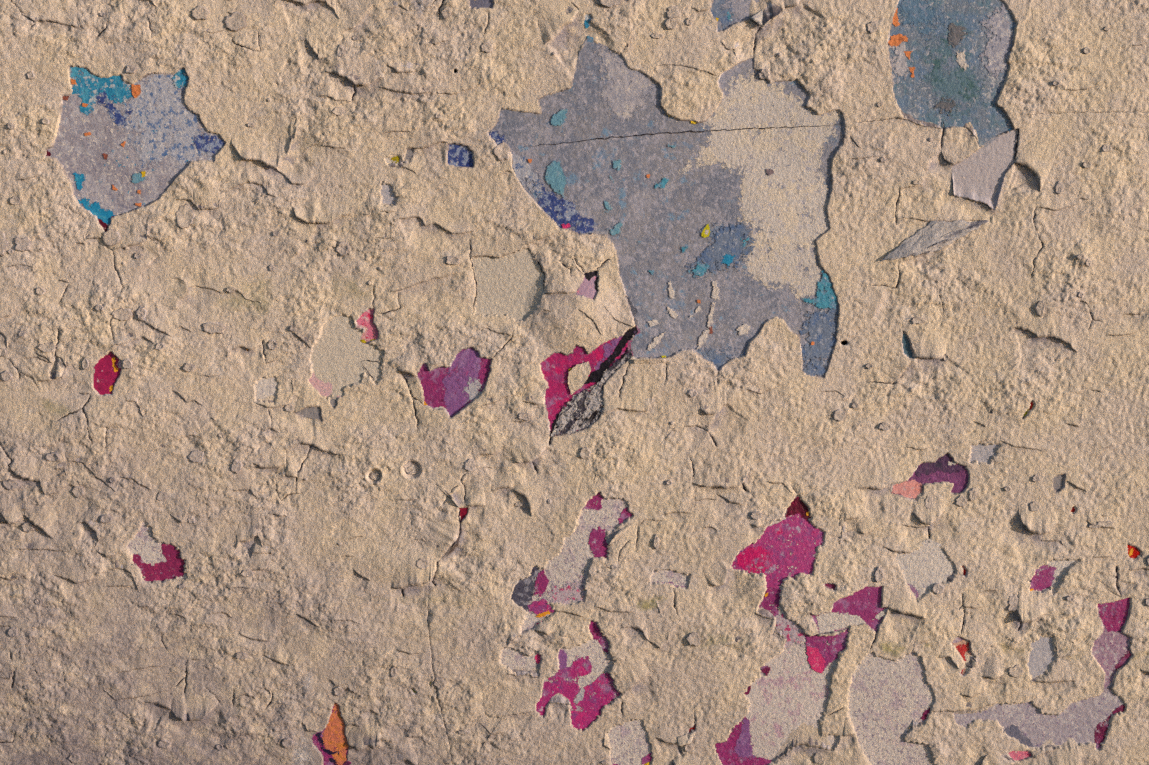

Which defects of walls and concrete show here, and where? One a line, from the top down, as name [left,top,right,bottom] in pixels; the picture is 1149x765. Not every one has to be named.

crack [58,395,107,446]
peeling [0,424,187,618]
peeling [79,274,277,395]
peeling [17,65,345,285]
peeling [209,309,384,618]
crack [361,360,421,432]
crack [401,473,467,756]
peeling [273,0,862,765]
crack [528,248,610,289]
crack [525,125,830,147]
peeling [867,0,1095,262]
crack [1014,111,1145,160]